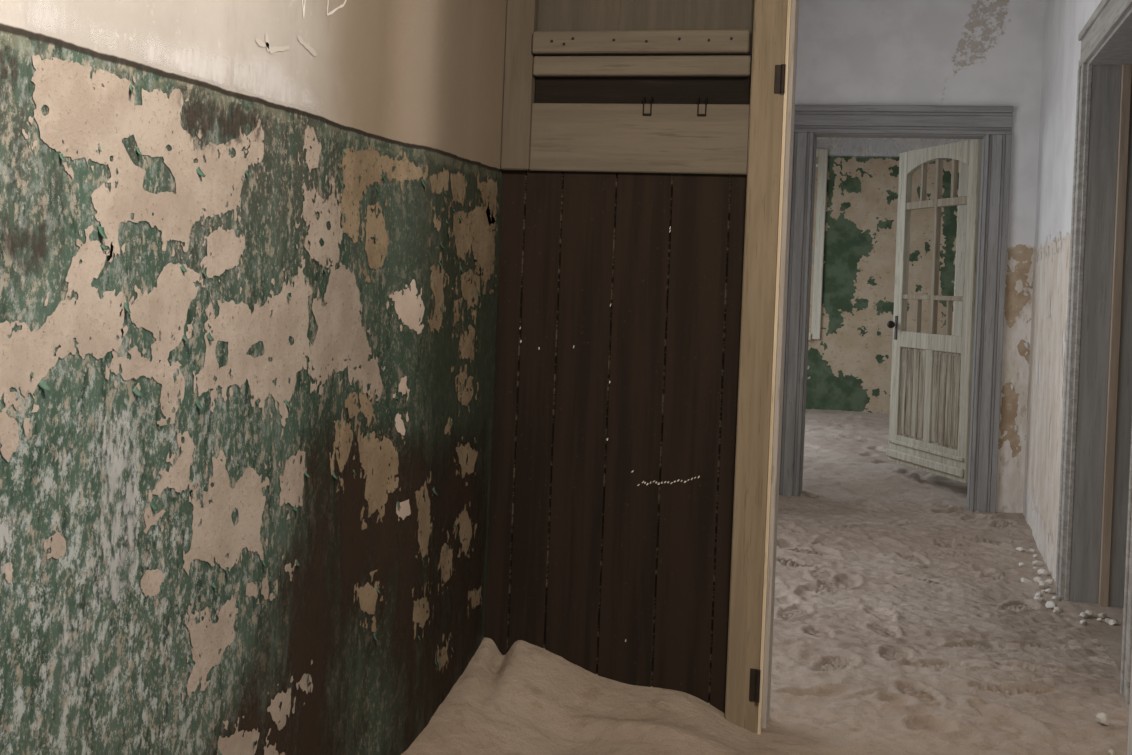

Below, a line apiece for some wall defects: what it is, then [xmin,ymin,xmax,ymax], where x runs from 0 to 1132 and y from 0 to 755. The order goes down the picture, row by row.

peeling [0,54,498,702]
peeling [808,145,960,414]
peeling [998,231,1071,555]
peeling [217,660,313,755]